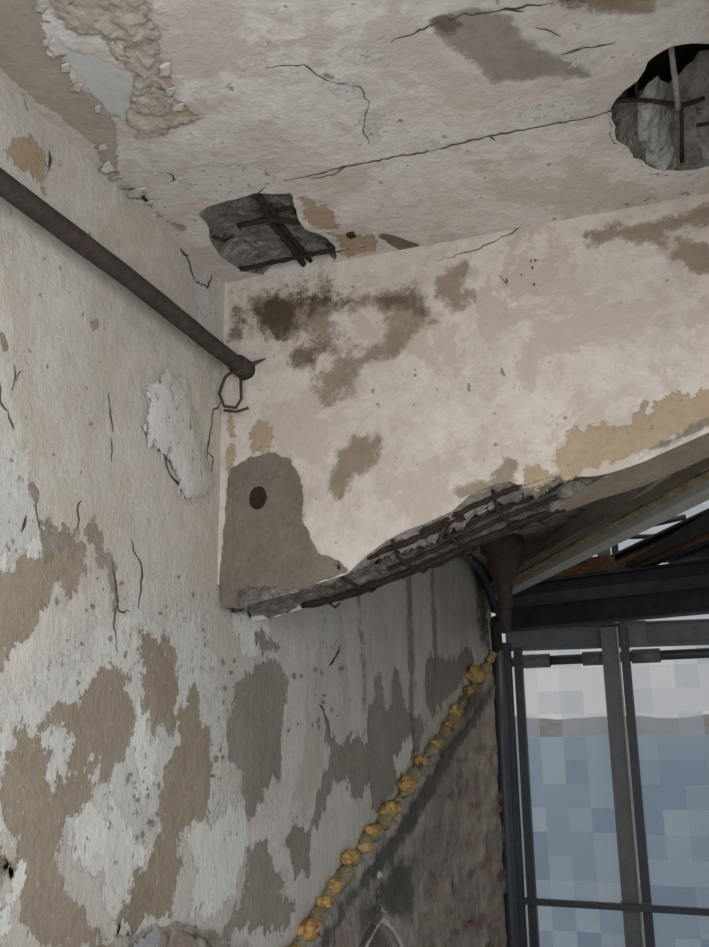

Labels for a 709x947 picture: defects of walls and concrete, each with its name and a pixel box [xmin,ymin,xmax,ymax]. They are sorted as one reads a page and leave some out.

crack [394,2,616,55]
damp [558,0,654,14]
spalling [0,0,204,235]
crack [251,64,669,201]
spalling [614,46,705,163]
spalling [199,193,366,275]
damp [584,203,709,274]
damp [230,262,475,407]
spalling [249,388,709,619]
peeling [0,481,125,673]
crack [112,541,143,652]
peeling [0,627,507,947]